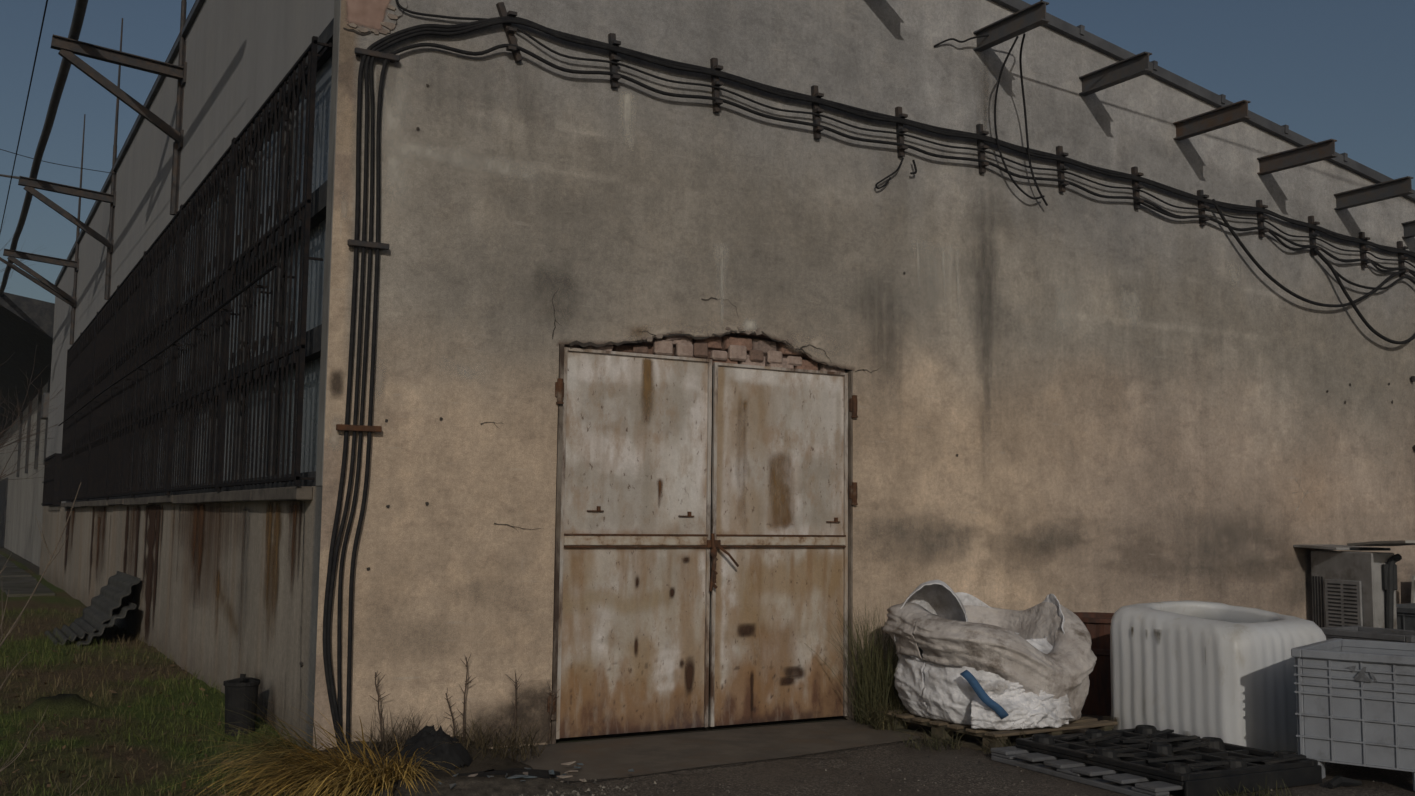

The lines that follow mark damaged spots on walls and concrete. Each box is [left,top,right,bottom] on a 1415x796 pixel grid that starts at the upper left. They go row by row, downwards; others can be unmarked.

spalling [564,321,846,373]
rust [64,508,75,569]
rust [89,505,163,640]
rust [266,502,302,615]